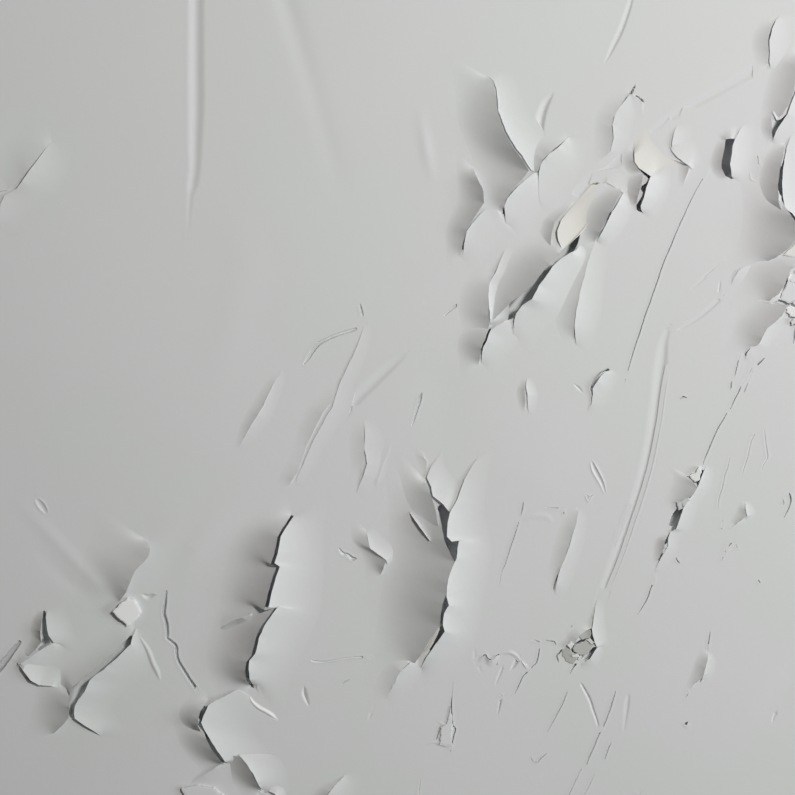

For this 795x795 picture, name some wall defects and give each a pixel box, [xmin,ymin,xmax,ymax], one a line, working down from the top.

peeling [445,11,795,377]
peeling [517,376,538,415]
peeling [0,598,152,741]
peeling [173,490,330,795]
peeling [335,401,531,756]
peeling [565,588,610,670]
peeling [652,465,714,582]
crack [682,629,716,701]
peeling [314,772,363,795]